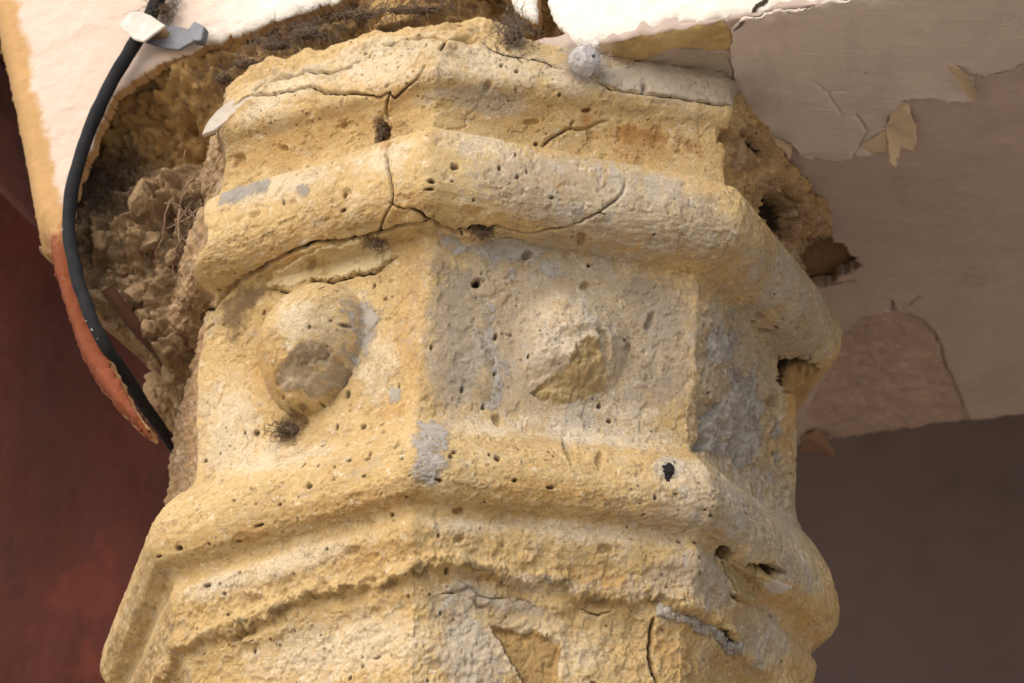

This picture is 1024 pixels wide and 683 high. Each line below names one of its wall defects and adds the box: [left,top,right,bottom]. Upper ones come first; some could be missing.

crack [274,46,416,103]
crack [482,42,556,68]
peeling [597,0,1024,167]
peeling [202,96,255,137]
crack [262,160,495,267]
hole [758,199,780,238]
crack [316,273,377,284]
crack [647,619,655,681]